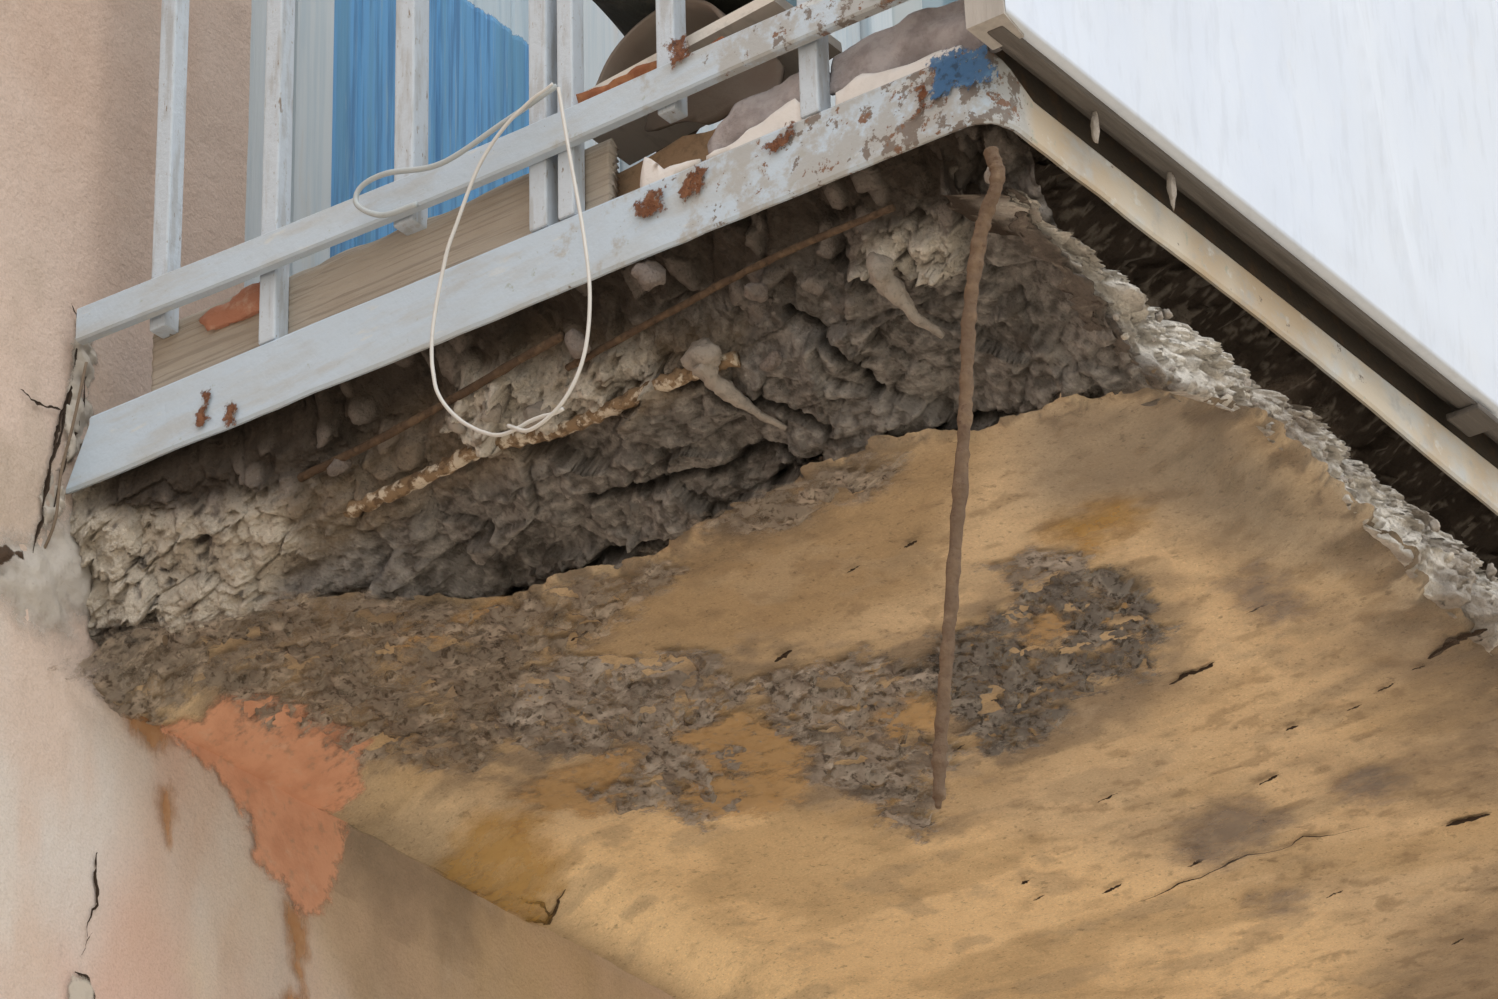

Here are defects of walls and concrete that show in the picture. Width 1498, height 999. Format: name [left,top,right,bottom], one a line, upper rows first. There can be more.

corrosion [576,34,693,103]
corrosion [909,83,934,121]
corrosion [762,121,795,154]
corrosion [633,166,709,218]
crack [21,303,86,553]
corrosion [195,389,237,428]
spalling [40,124,1498,915]
crack [68,853,99,999]